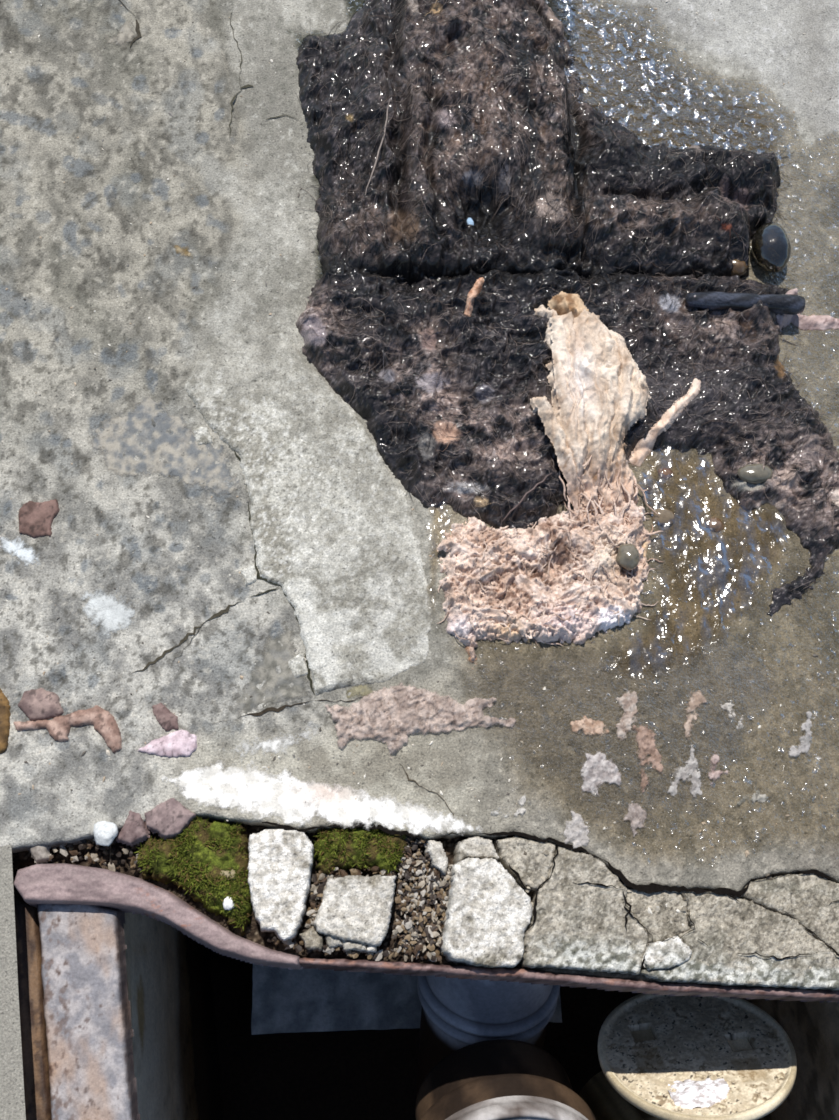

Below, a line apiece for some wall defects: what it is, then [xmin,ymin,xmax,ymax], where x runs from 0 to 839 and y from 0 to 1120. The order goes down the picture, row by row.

water stain [347,0,366,17]
water stain [544,0,839,427]
crack [131,503,375,730]
water stain [630,452,810,705]
water stain [161,722,478,834]
crack [262,763,839,971]